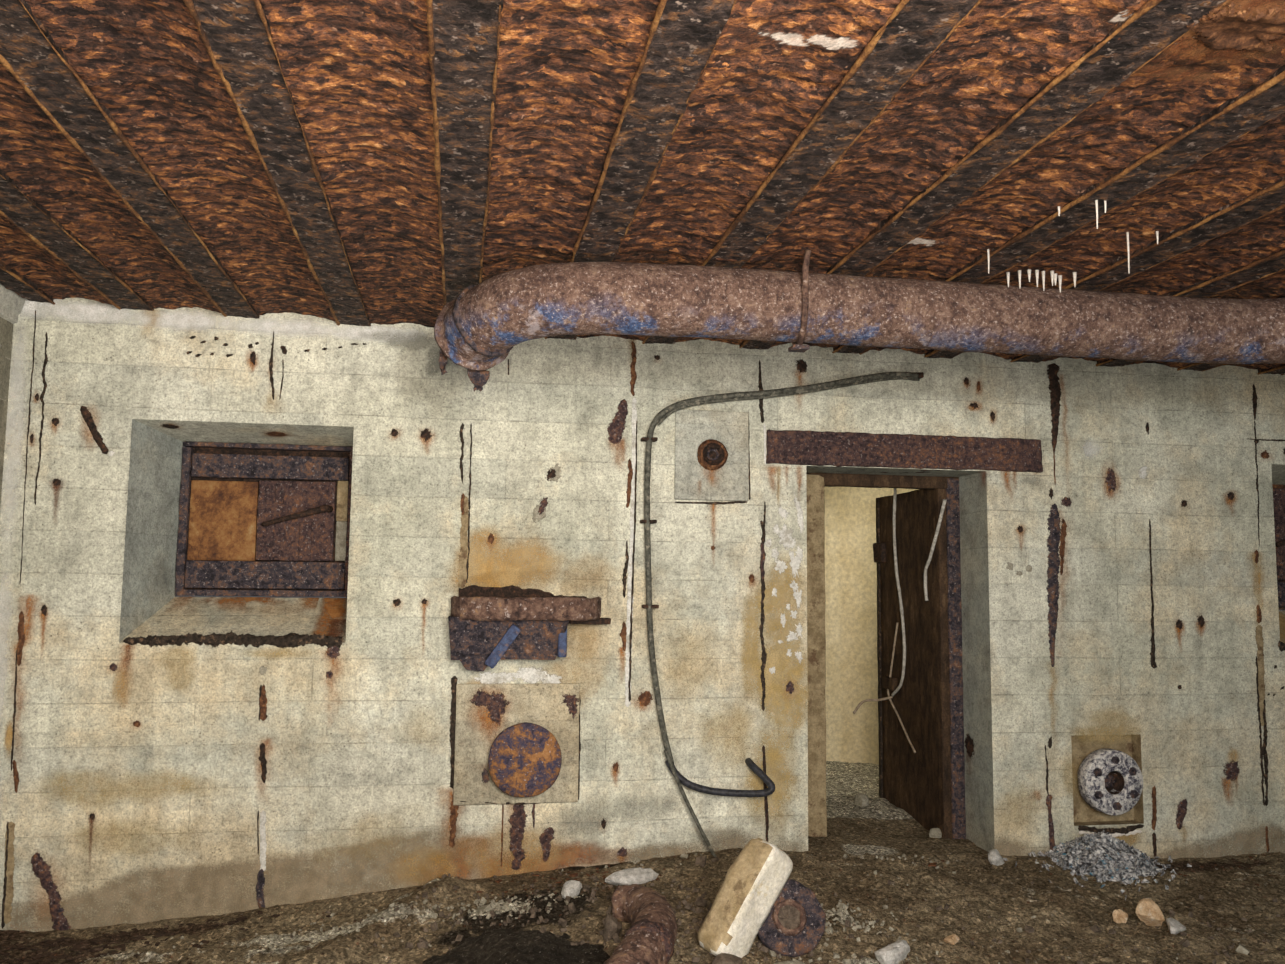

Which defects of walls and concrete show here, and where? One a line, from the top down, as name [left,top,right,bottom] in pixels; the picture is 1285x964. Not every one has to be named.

rust [607,399,628,446]
rust [15,596,47,666]
rust [471,683,510,733]
damp [743,562,808,816]
rust [5,725,19,793]
damp [7,791,457,932]
rust [404,804,627,881]